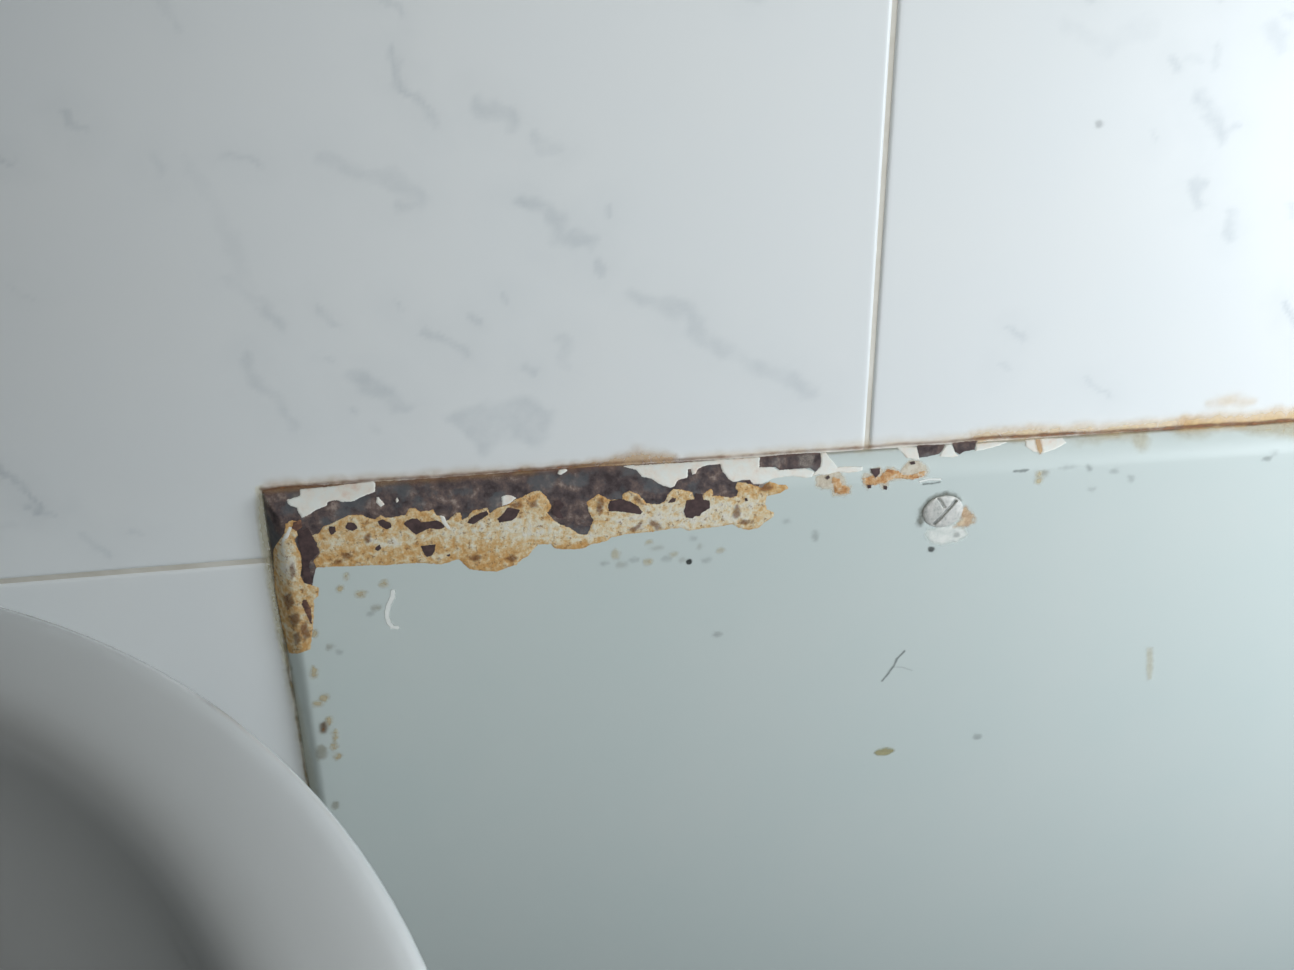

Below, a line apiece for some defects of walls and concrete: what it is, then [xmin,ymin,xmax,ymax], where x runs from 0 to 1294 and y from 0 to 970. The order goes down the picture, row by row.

rust [972,412,1294,441]
peeling [760,452,863,476]
peeling [897,441,1006,460]
rust [261,455,927,697]